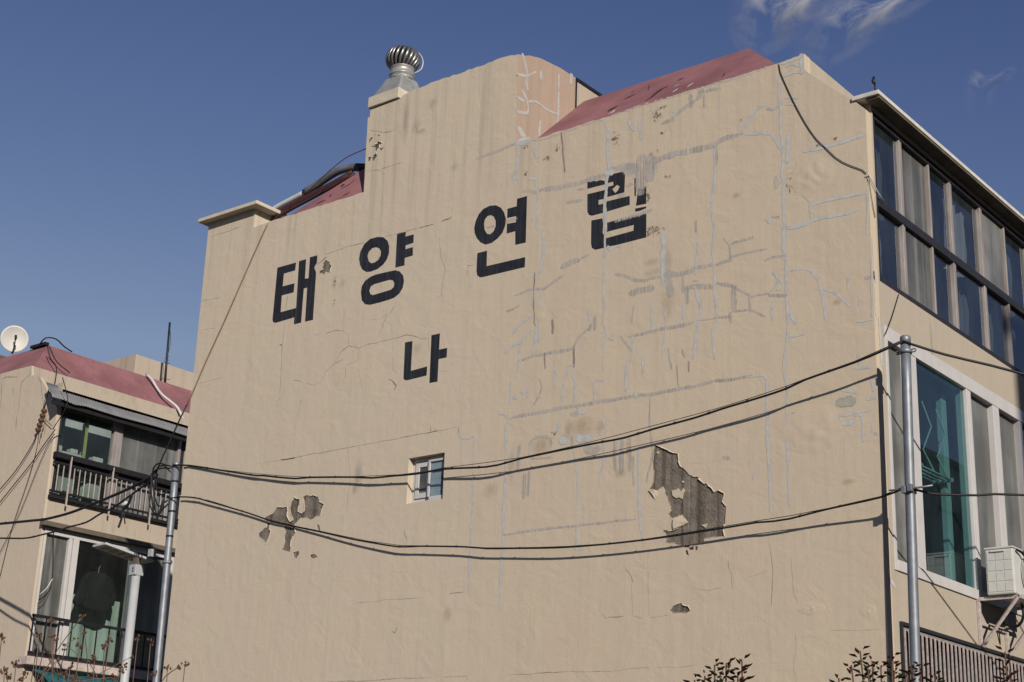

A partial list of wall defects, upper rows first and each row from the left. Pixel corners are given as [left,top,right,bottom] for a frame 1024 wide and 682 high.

peeling [368,135,383,162]
peeling [258,494,324,559]
peeling [649,444,726,555]
peeling [670,603,691,613]